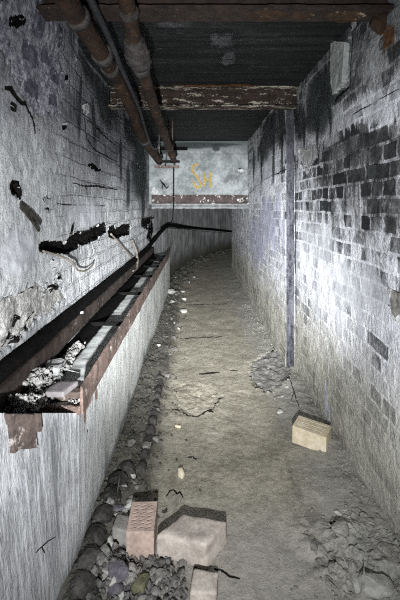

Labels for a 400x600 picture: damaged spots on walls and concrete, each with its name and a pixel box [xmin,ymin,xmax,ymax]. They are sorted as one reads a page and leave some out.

rust [324,11,394,53]
water stain [315,90,337,157]
water stain [364,125,396,191]
spalling [0,222,132,351]
crack [172,398,221,417]